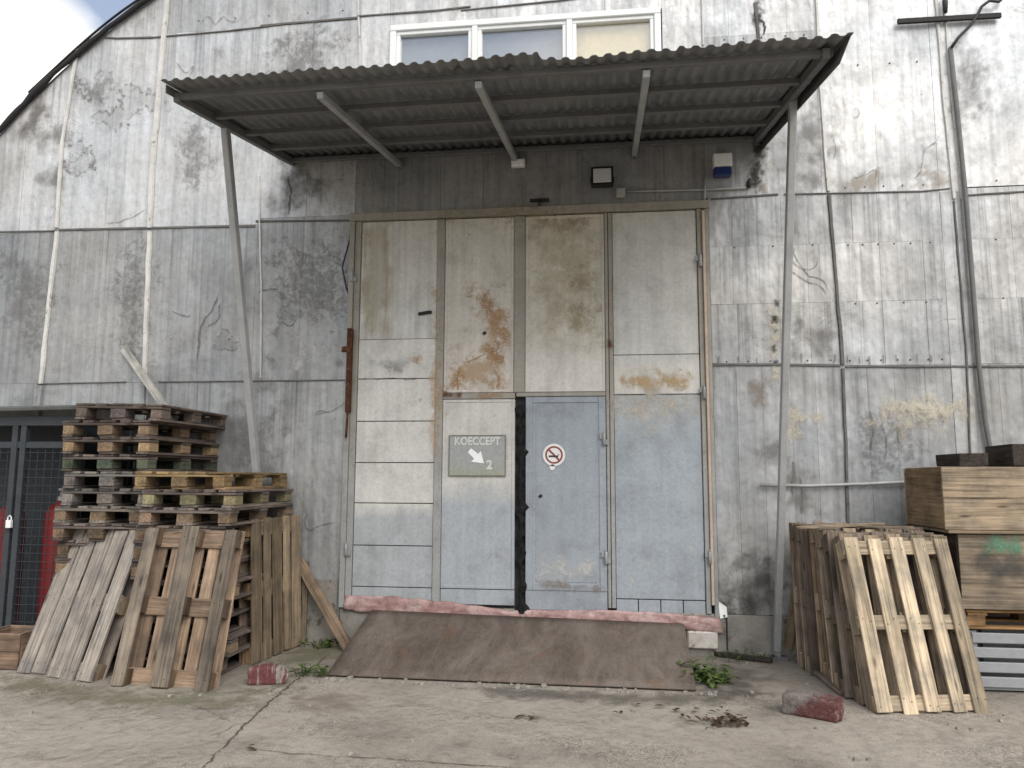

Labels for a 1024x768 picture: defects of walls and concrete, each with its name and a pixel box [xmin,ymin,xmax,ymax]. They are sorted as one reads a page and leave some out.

water stain [20,102,96,184]
corrosion [430,297,510,406]
corrosion [621,373,686,393]